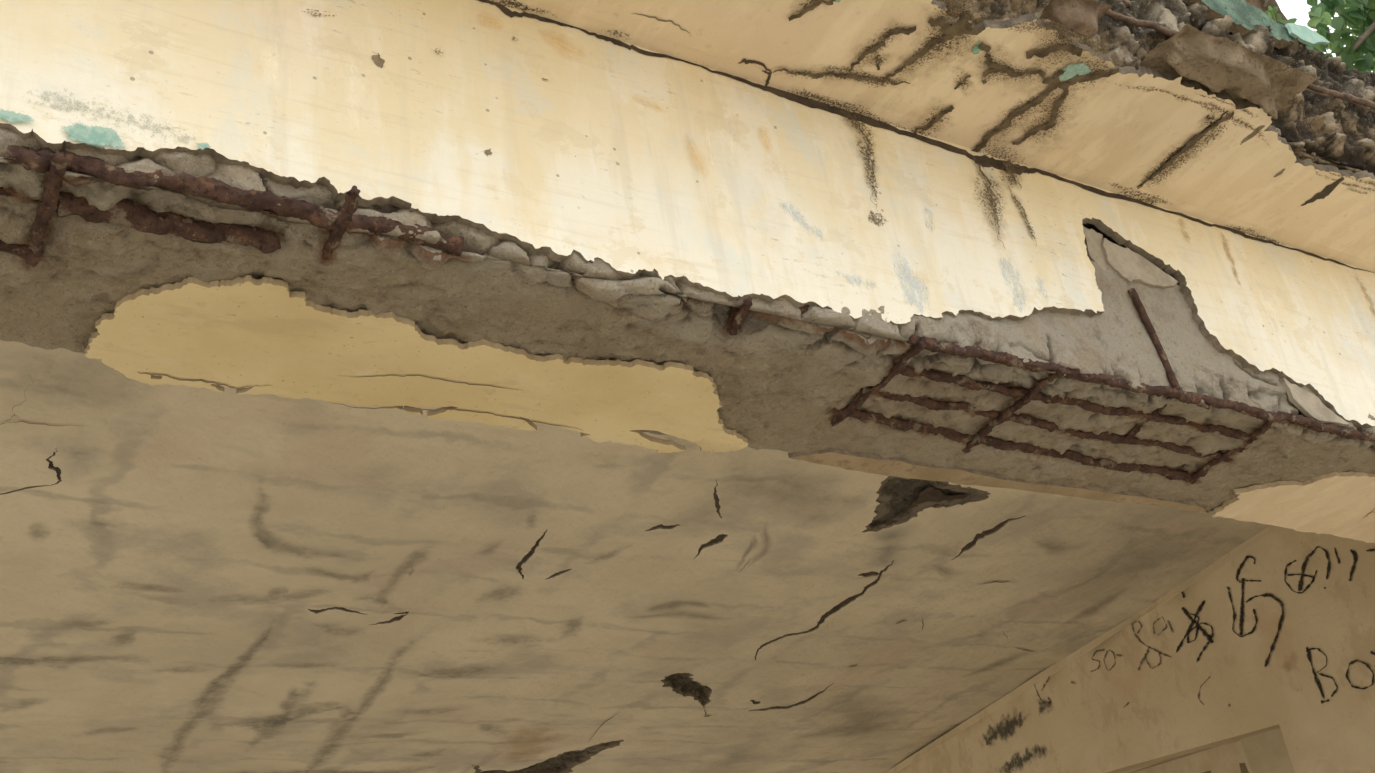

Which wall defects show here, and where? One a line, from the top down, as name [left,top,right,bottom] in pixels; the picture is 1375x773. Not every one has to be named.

damp [492,0,554,15]
crack [478,0,1374,273]
damp [773,0,1119,248]
spalling [937,0,1375,176]
damp [1112,86,1263,205]
damp [1307,161,1375,194]
spalling [0,92,1375,531]
crack [755,562,892,659]
spalling [663,673,711,706]
crack [752,690,824,710]
spalling [474,740,621,773]